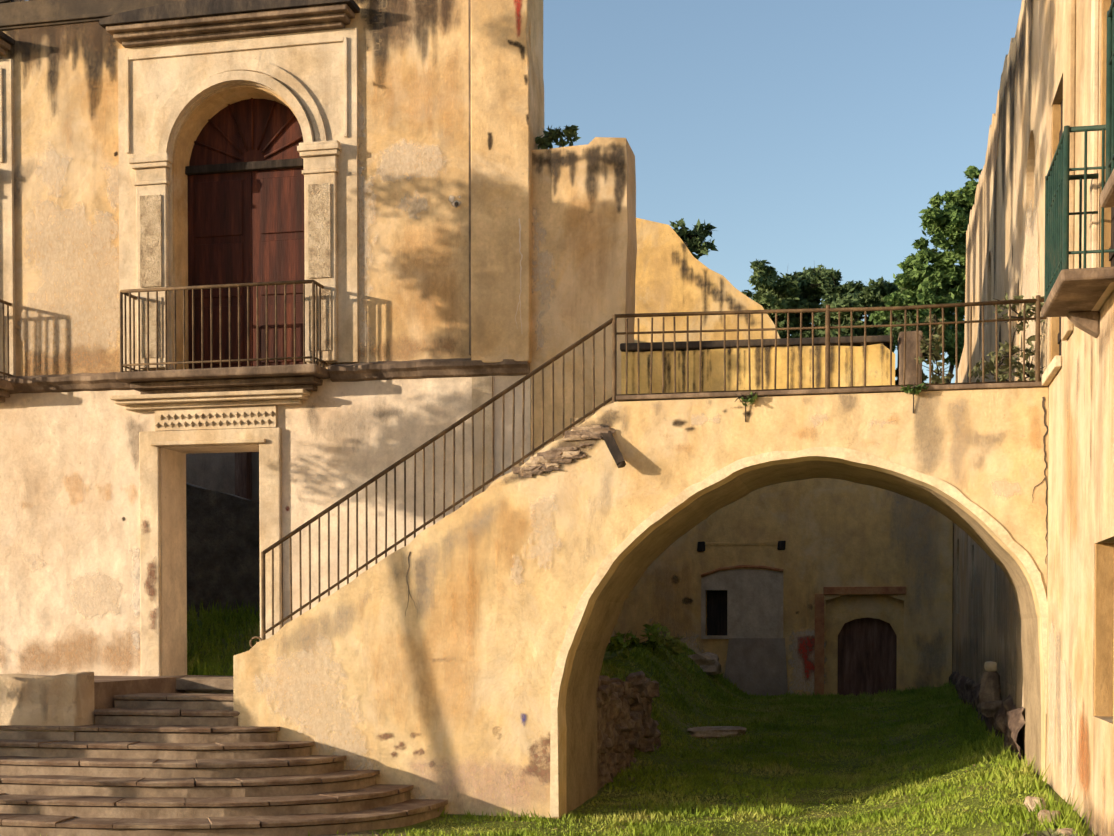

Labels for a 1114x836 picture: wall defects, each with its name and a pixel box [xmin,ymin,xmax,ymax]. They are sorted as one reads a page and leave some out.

leakage [7,21,117,116]
leakage [534,144,626,211]
leakage [966,0,1032,383]
leakage [640,348,711,391]
leakage [727,346,771,387]
leakage [790,344,847,389]
spalling [505,411,616,483]
crack [1032,397,1049,563]
spalling [144,562,157,628]
crack [405,552,418,615]
leakage [21,636,141,671]
spalling [524,739,550,782]